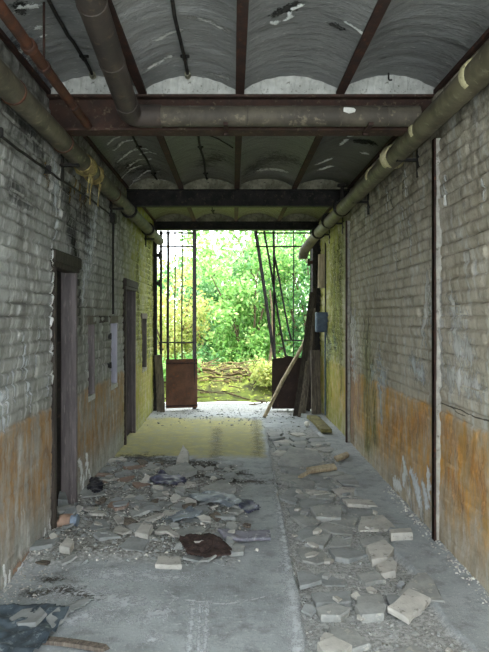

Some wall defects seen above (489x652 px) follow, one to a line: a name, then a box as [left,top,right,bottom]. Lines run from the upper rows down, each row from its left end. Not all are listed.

flaking render [269,1,305,25]
flaking render [327,21,363,35]
leakage [326,255,386,449]
crack [441,403,489,422]